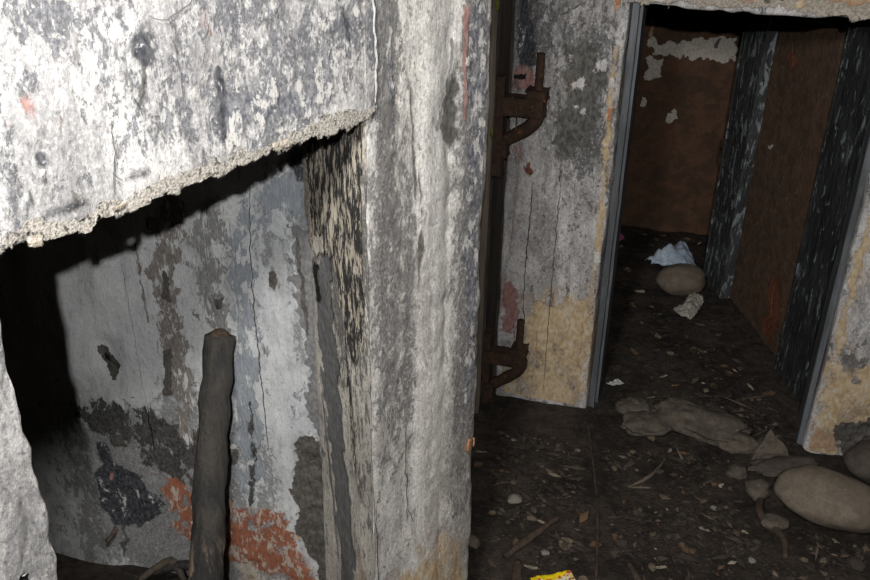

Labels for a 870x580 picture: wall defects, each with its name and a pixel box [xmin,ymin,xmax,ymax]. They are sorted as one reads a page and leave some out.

spalling [638,0,870,22]
corrosion [513,65,535,89]
peeling [643,18,739,81]
peeling [665,108,677,136]
corrosion [511,140,533,189]
peeling [834,216,870,355]
peeling [0,106,375,580]
damp [503,292,591,405]
damp [808,345,870,455]
spalling [833,417,870,457]